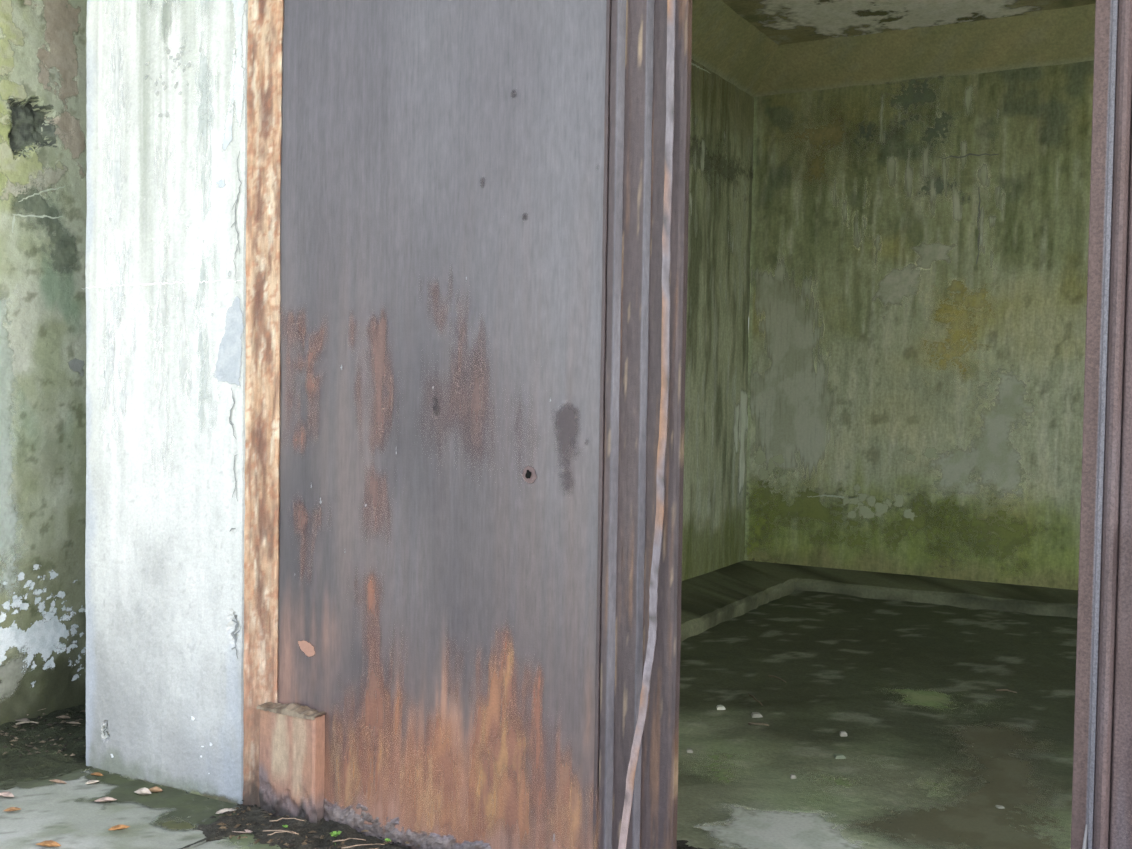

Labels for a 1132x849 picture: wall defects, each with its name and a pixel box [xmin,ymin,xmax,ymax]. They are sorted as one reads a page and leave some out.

peeling [0,0,86,200]
damp [145,0,218,215]
damp [855,5,907,25]
damp [847,76,970,220]
damp [955,13,989,24]
damp [159,262,208,429]
peeling [0,648,28,699]
rust [328,576,412,807]
rust [458,634,593,849]